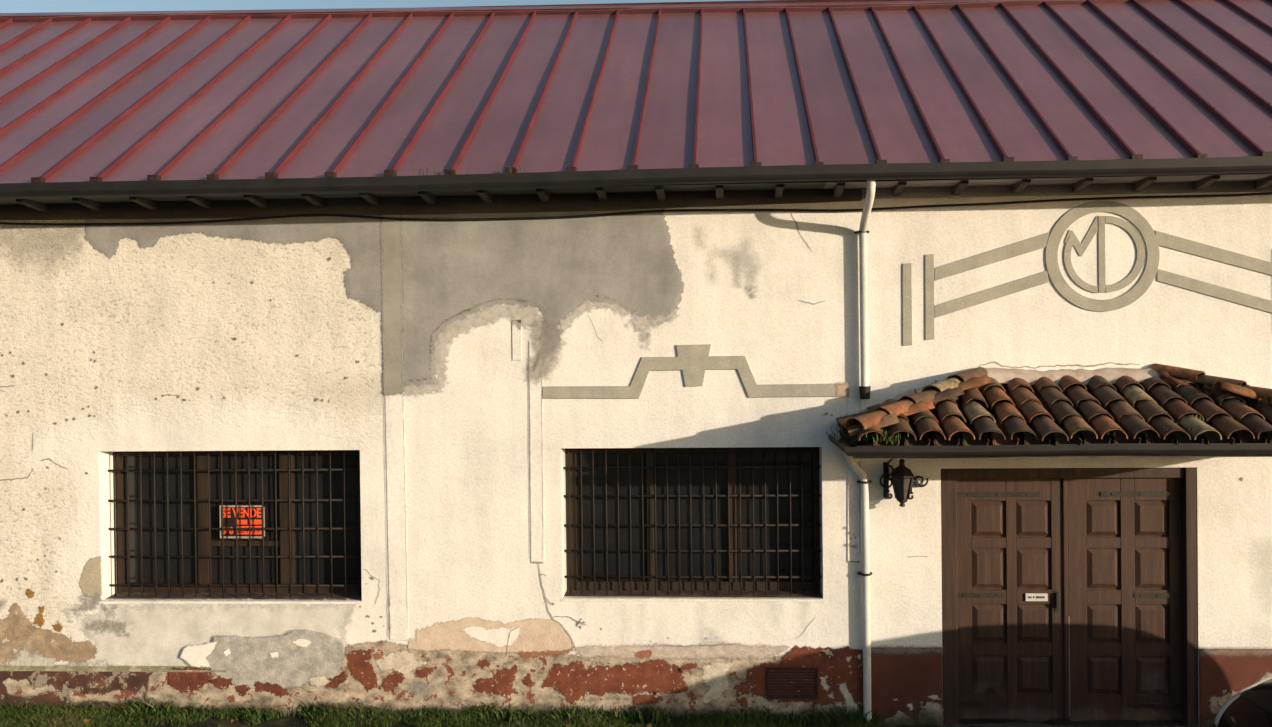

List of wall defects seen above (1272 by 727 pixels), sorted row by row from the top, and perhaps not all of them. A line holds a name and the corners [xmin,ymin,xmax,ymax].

crack [790,212,812,252]
peeling [84,208,684,396]
crack [539,568,585,649]
flaking render [0,601,864,719]
peeling [1210,672,1272,714]